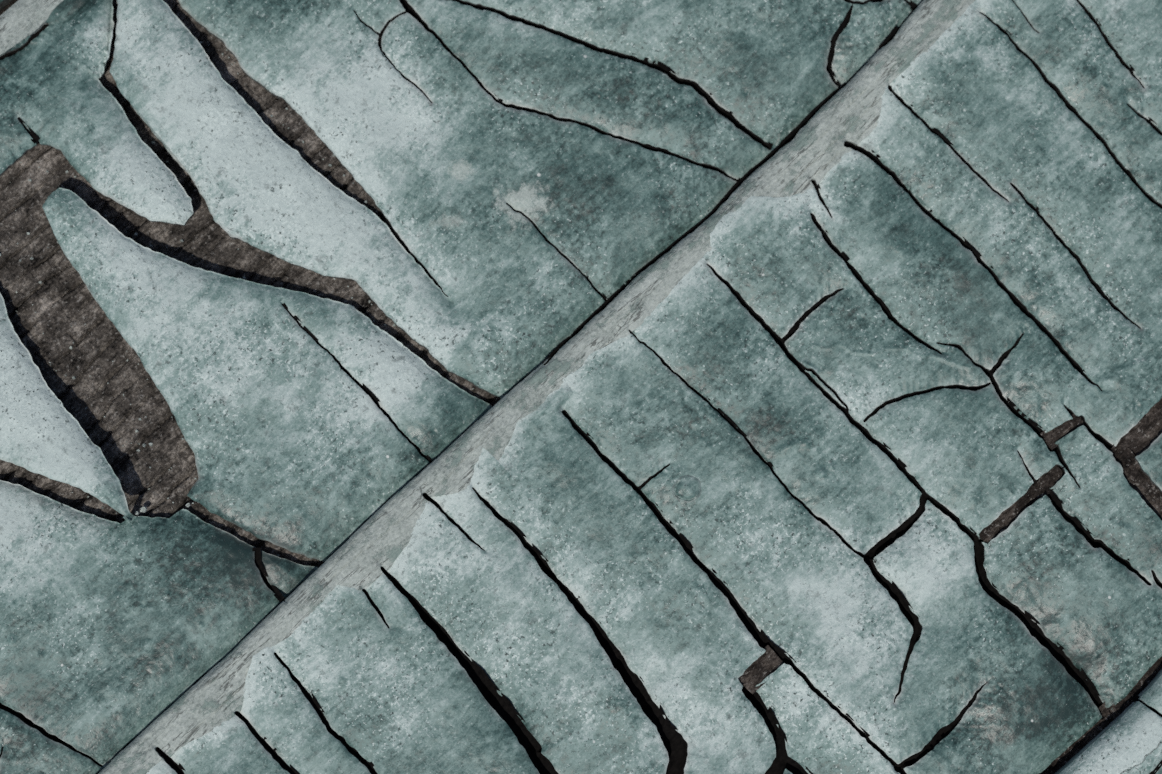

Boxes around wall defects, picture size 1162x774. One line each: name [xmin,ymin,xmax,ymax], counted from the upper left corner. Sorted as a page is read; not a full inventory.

peeling [0,0,501,568]
crack [354,0,918,365]
crack [888,86,1140,328]
crack [981,0,1162,209]
crack [0,703,102,767]
crack [156,748,185,774]
crack [236,711,299,774]
crack [424,493,485,551]
crack [362,568,559,774]
crack [472,488,687,774]
crack [562,410,987,774]
crack [630,141,1162,720]